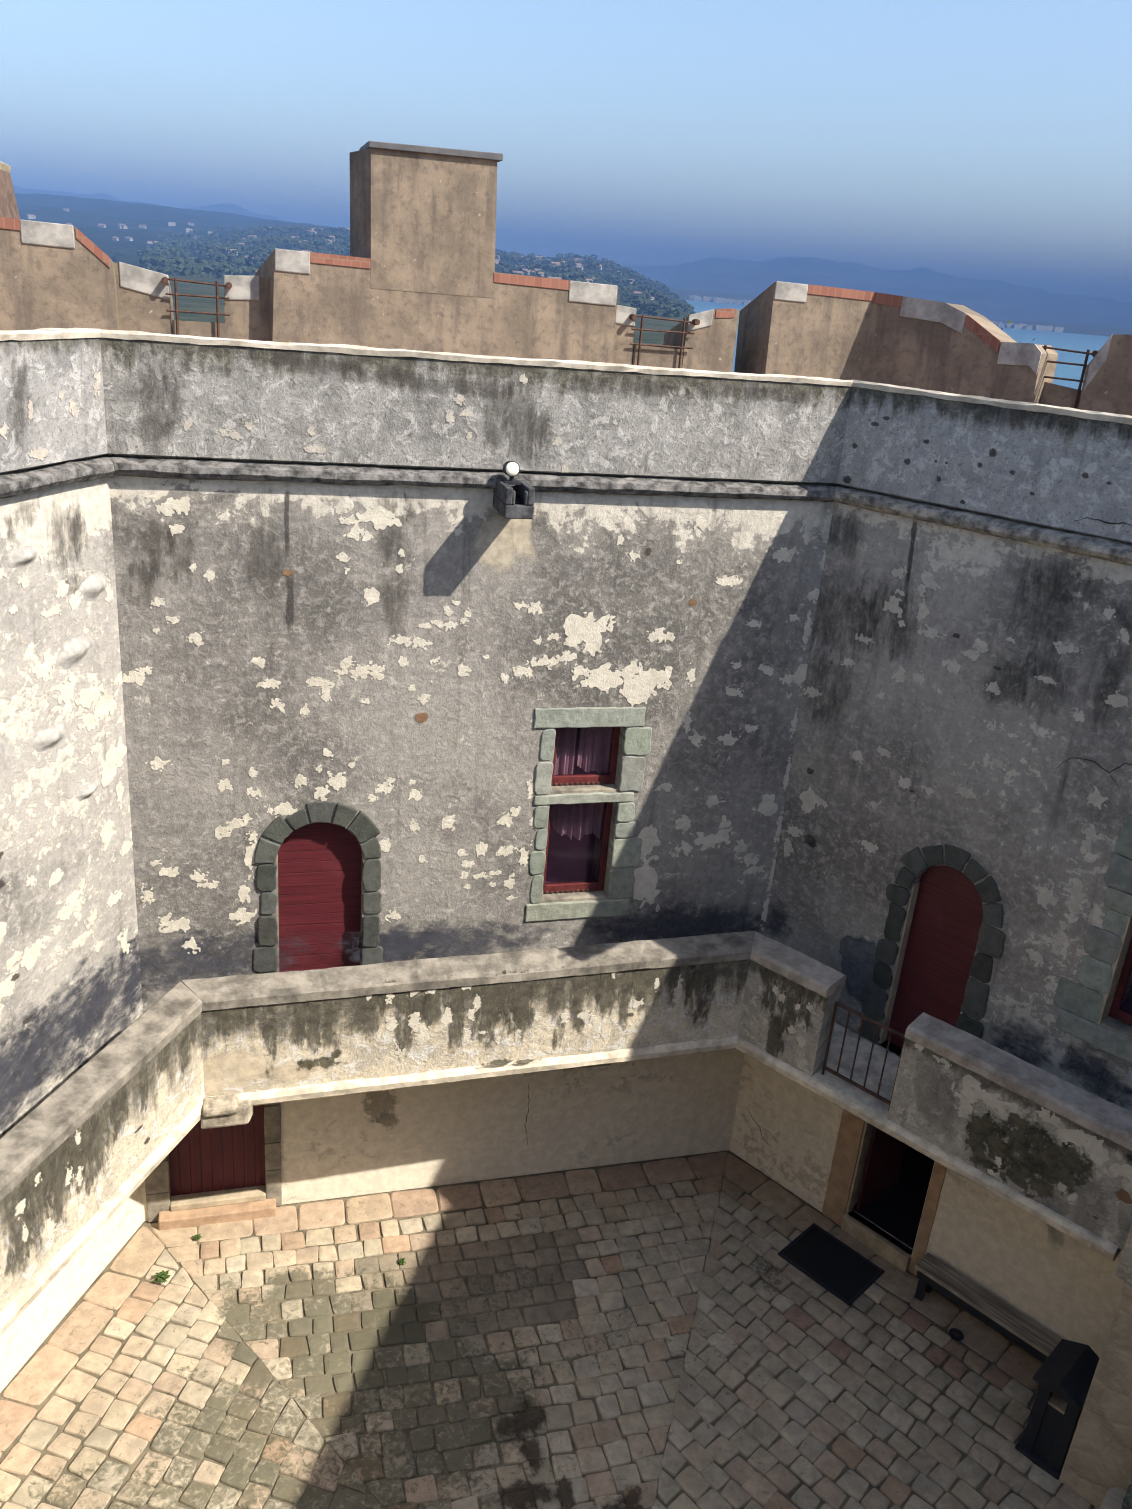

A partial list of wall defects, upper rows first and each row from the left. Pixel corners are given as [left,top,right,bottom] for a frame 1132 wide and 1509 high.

flaking render [141,492,190,536]
flaking render [336,506,402,575]
flaking render [250,600,471,717]
flaking render [500,612,696,707]
flaking render [633,509,832,931]
crack [1057,758,1132,789]
flaking render [457,777,539,901]
leakage [378,922,543,962]
leakage [594,902,791,943]
leakage [0,931,293,1137]
leakage [213,963,717,1075]
leakage [5,1021,196,1274]